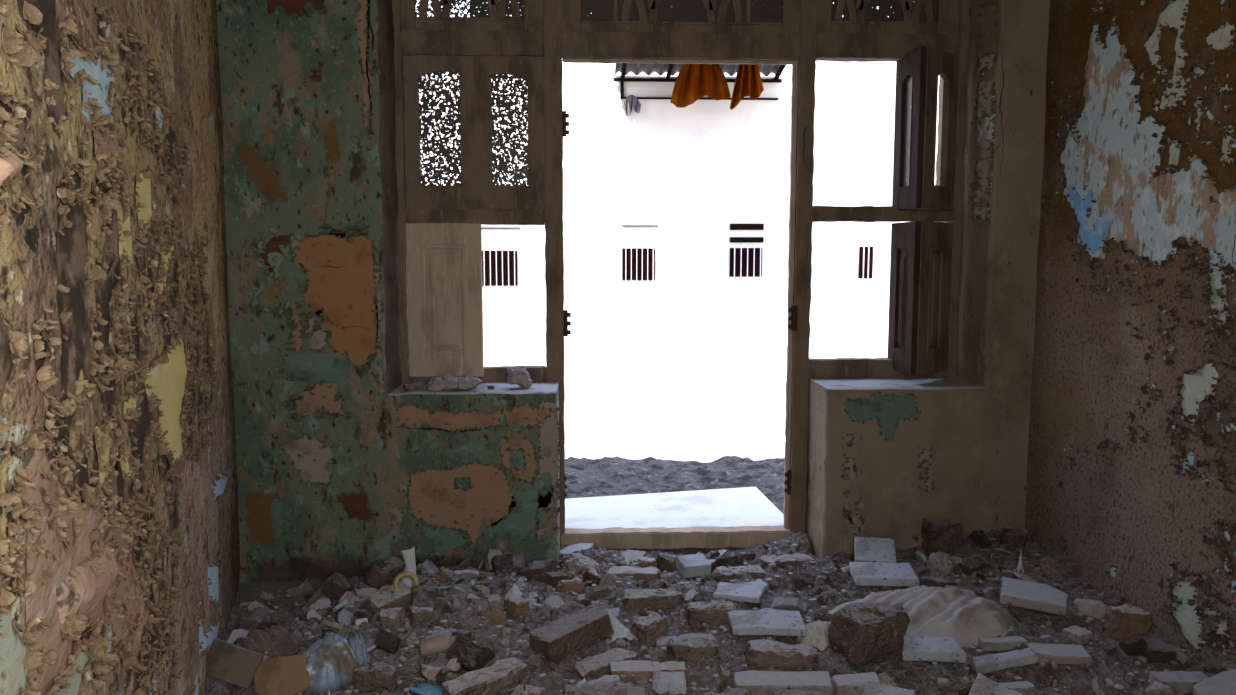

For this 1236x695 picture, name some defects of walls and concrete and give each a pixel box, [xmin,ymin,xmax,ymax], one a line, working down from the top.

peeling [1057,0,1236,492]
peeling [254,219,563,552]
peeling [211,470,230,503]
peeling [841,391,919,535]
peeling [197,559,224,656]
peeling [1158,519,1236,656]